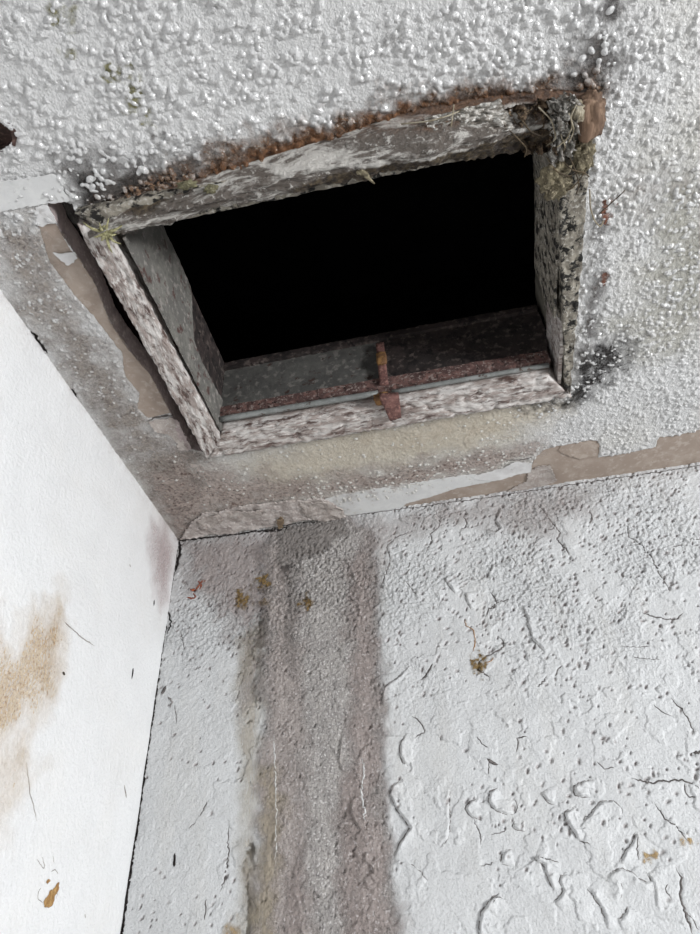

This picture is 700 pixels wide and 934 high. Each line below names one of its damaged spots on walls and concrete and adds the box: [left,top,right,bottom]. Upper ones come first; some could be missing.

corrosion [121,85,515,198]
corrosion [529,75,561,94]
peeling [36,205,191,451]
water stain [109,276,634,530]
peeling [180,430,700,540]
water stain [193,516,398,934]
crack [120,465,700,934]